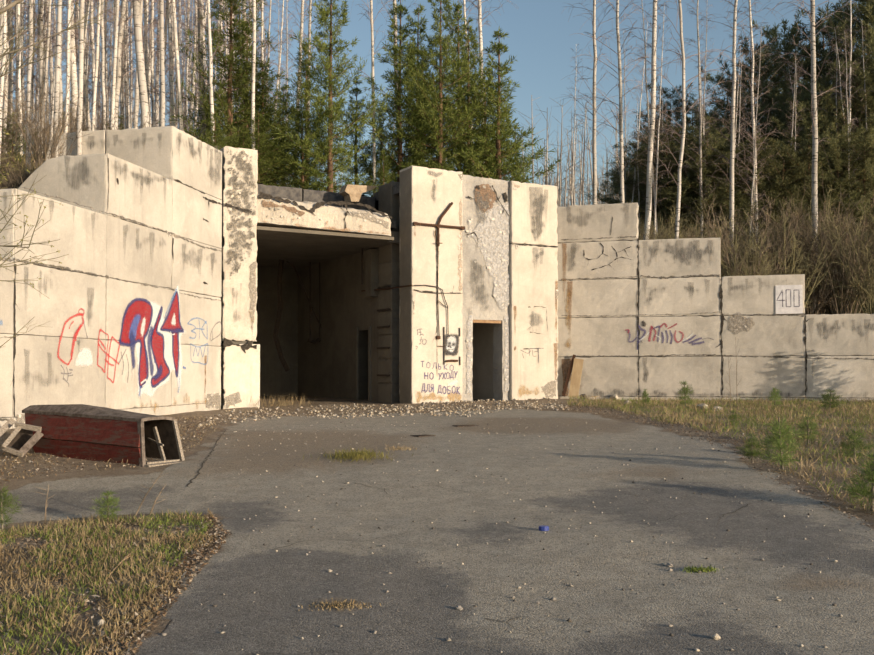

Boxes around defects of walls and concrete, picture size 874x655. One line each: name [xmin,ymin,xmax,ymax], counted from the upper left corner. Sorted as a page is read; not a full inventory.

spalling [226,149,305,332]
spalling [352,211,390,229]
corrosion [413,222,465,251]
leakage [532,196,544,238]
peeling [458,184,519,391]
crack [583,217,643,395]
spalling [728,313,765,334]